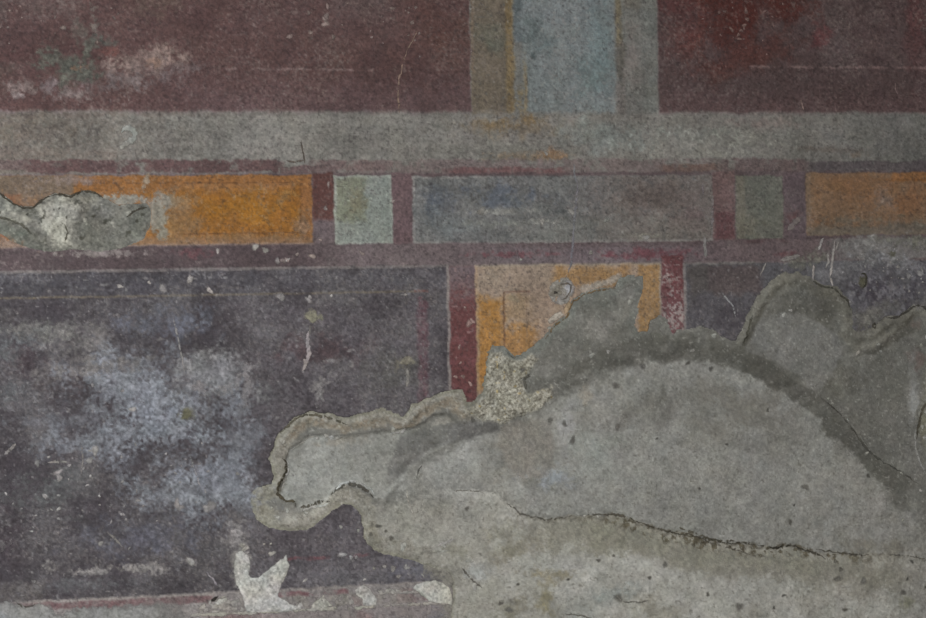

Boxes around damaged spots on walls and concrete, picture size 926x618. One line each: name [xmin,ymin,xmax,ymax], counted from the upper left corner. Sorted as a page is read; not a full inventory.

flaking render [0,190,151,252]
flaking render [250,242,926,618]